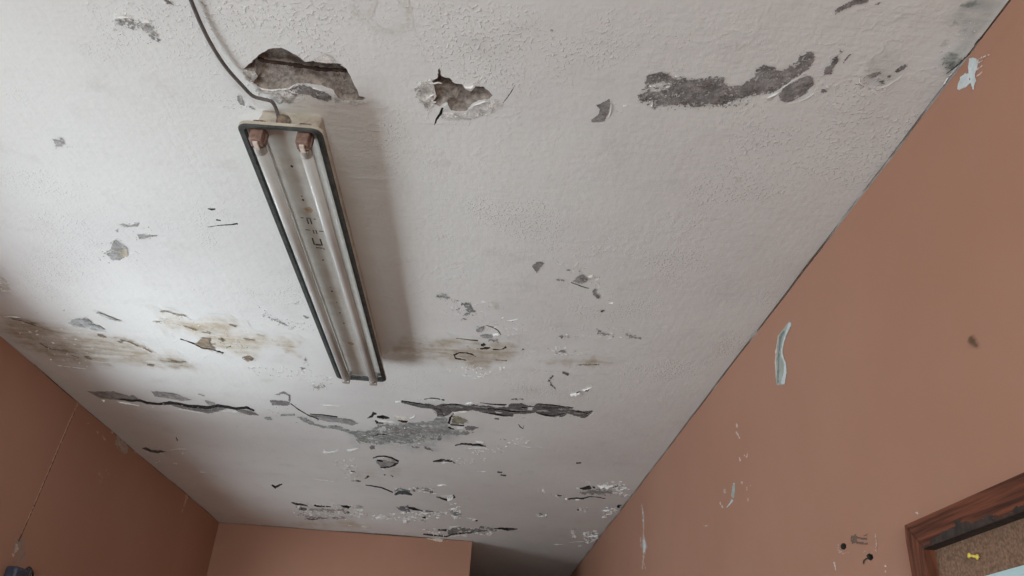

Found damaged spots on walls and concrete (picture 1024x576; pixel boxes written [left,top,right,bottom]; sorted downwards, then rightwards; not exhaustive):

spalling [220,48,368,110]
spalling [414,68,513,125]
peeling [590,50,851,124]
peeling [942,54,990,90]
peeling [99,222,158,261]
leakage [0,304,306,376]
leakage [384,332,527,379]
peeling [775,322,792,385]
peeling [248,358,499,459]
peeling [288,502,400,532]
peeling [436,495,478,522]
peeling [577,481,630,518]